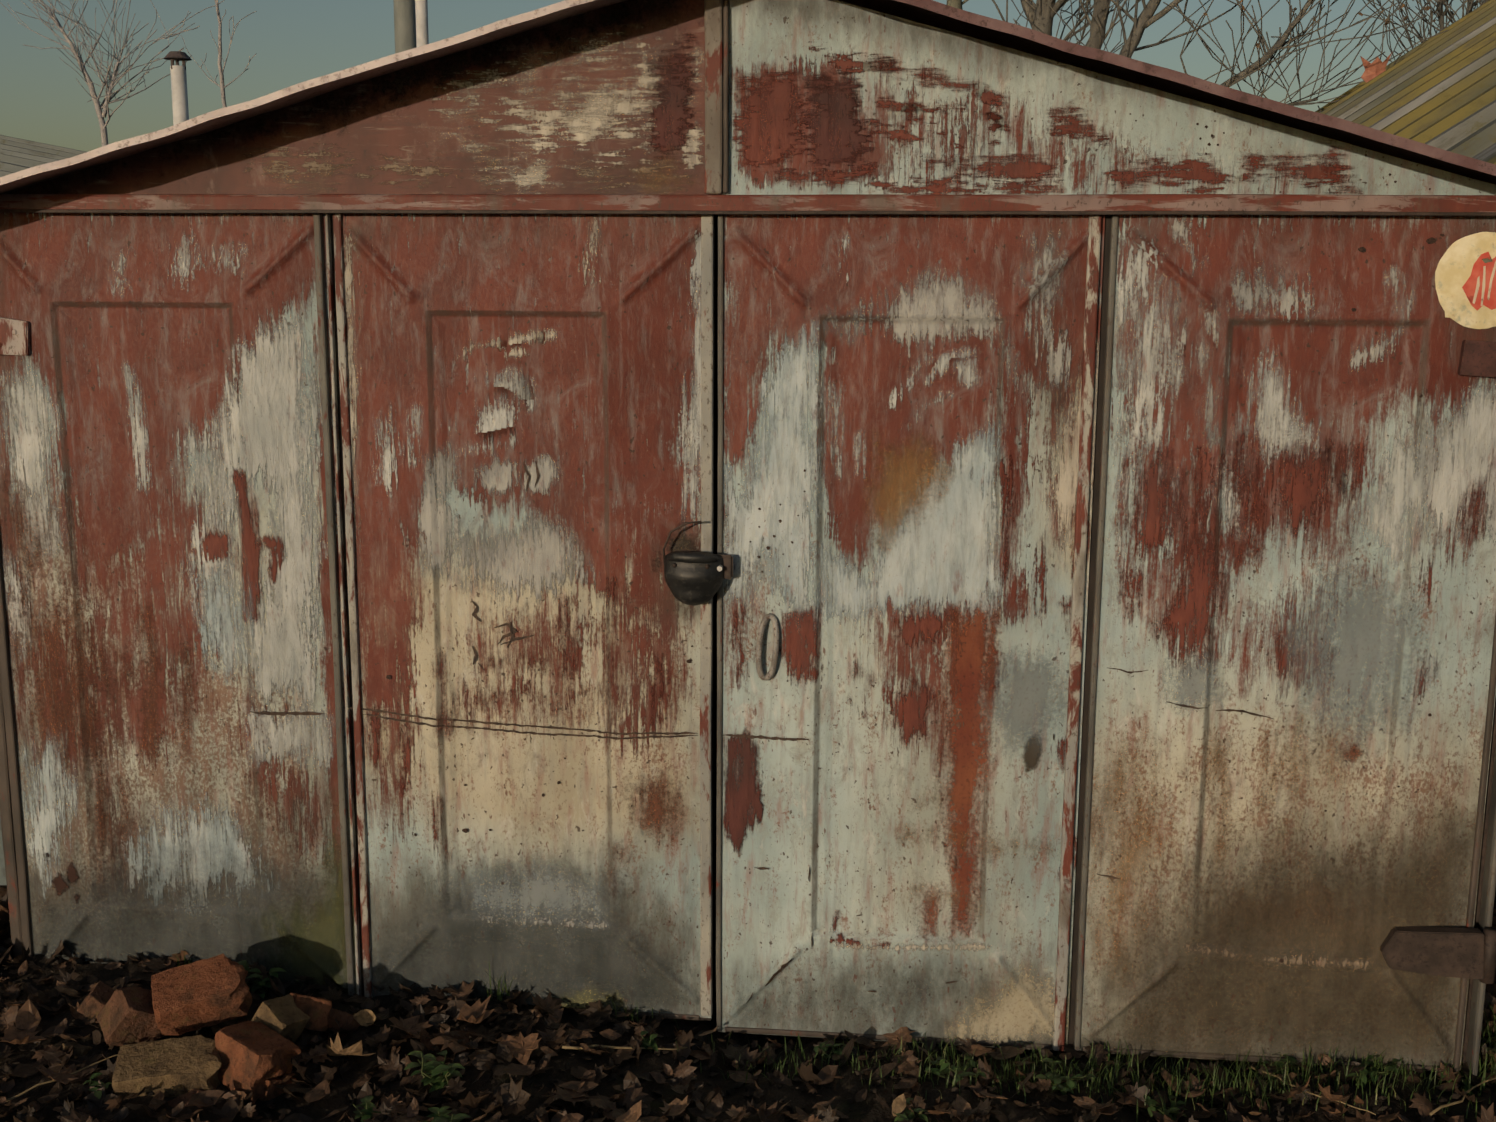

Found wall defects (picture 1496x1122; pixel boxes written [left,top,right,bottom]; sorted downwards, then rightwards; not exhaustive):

peeling [430,32,704,194]
peeling [732,42,1063,195]
peeling [1104,120,1363,194]
peeling [1,368,62,659]
peeling [172,315,333,768]
peeling [373,329,617,713]
peeling [723,232,1098,684]
peeling [1108,215,1496,671]
corrosion [1342,744,1362,761]
water stain [42,877,302,980]
water stain [378,881,668,1008]
water stain [1135,855,1460,1056]